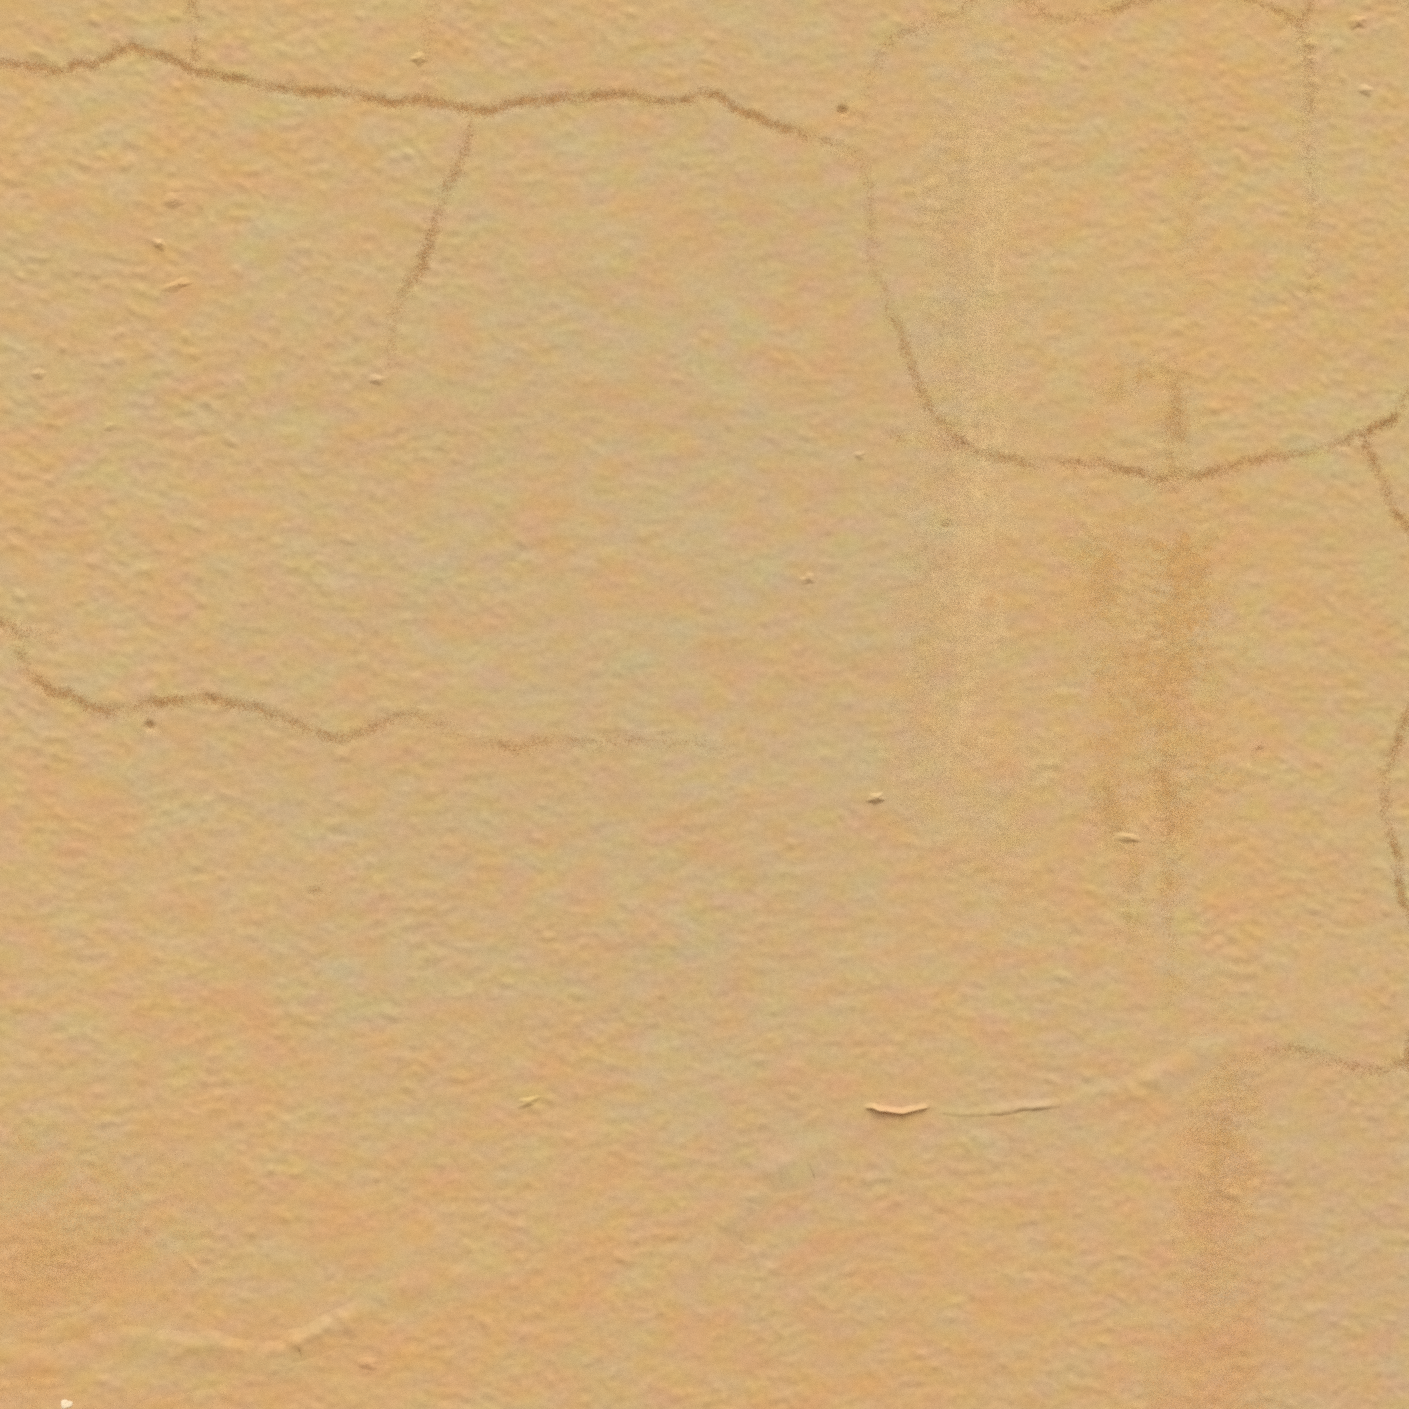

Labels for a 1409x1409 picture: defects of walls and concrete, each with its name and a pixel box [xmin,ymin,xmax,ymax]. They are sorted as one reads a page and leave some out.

crack [0,0,1409,535]
crack [0,616,726,756]
crack [1379,706,1409,923]
crack [1250,1035,1409,1075]